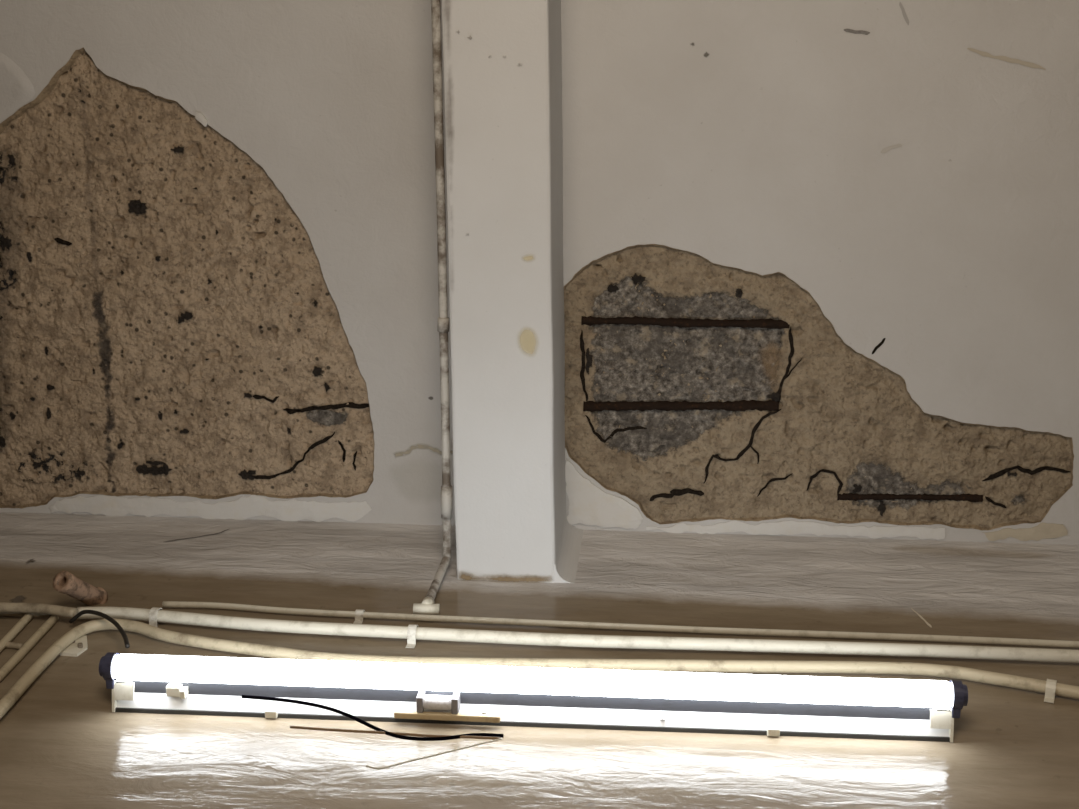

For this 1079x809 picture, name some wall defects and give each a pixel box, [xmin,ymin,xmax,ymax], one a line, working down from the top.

spalling [0,47,375,522]
spalling [564,244,1074,541]